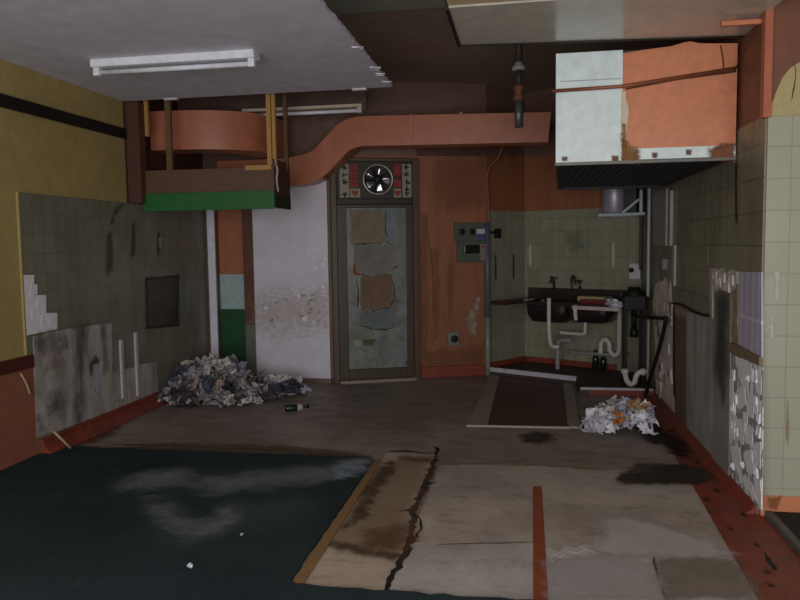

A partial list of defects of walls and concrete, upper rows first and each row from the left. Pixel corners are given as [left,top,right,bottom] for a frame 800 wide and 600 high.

rust [612,123,640,161]
rust [709,143,737,163]
spalling [23,275,158,438]
spalling [653,278,675,413]
leakage [520,432,556,443]
peeling [729,356,763,512]
crack [384,447,600,590]